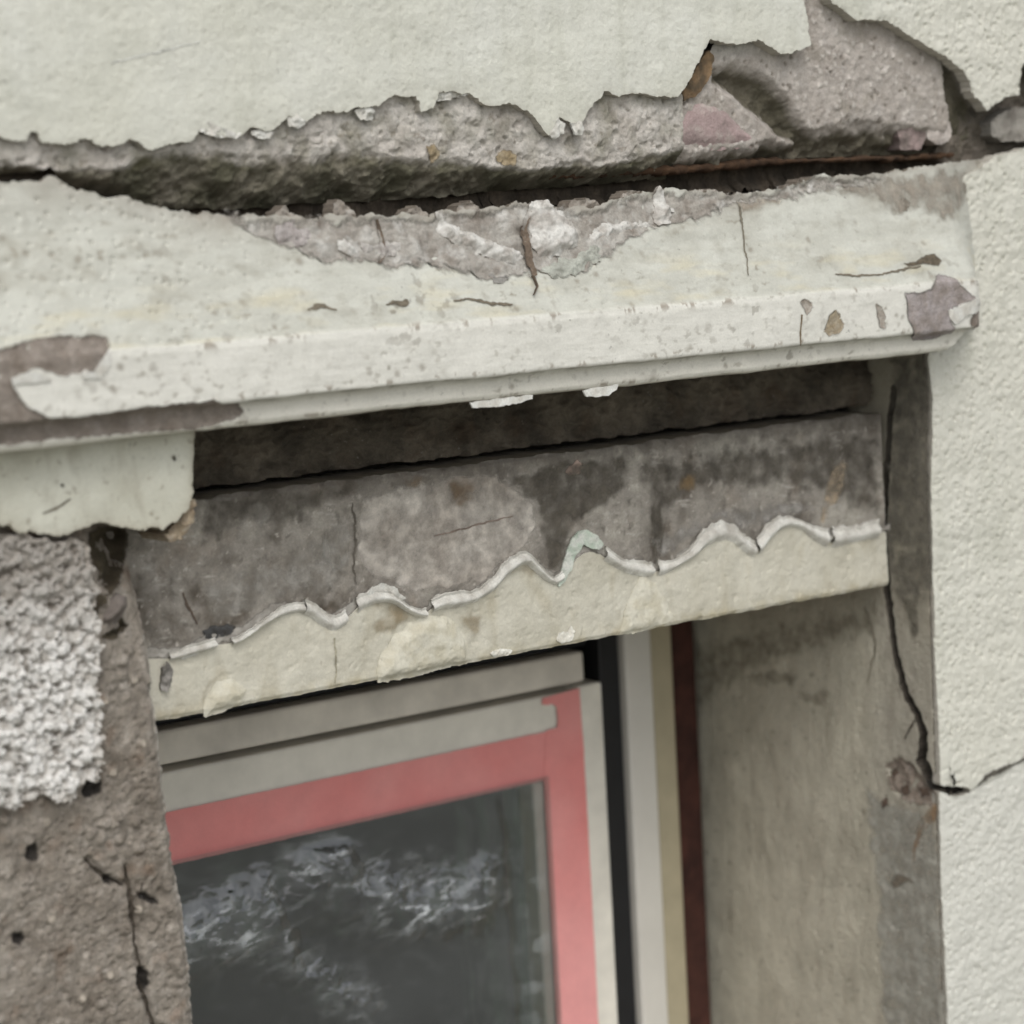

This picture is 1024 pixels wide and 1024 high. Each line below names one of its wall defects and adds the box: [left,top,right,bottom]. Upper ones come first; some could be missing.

crack [0,170,113,198]
spalling [0,0,1024,295]
crack [167,144,935,275]
crack [835,265,921,277]
peeling [905,253,981,340]
peeling [0,335,243,446]
spalling [88,526,129,640]
leakage [204,457,626,612]
peeling [147,515,891,692]
leakage [644,437,876,553]
crack [926,757,1024,794]
crack [85,859,154,1024]